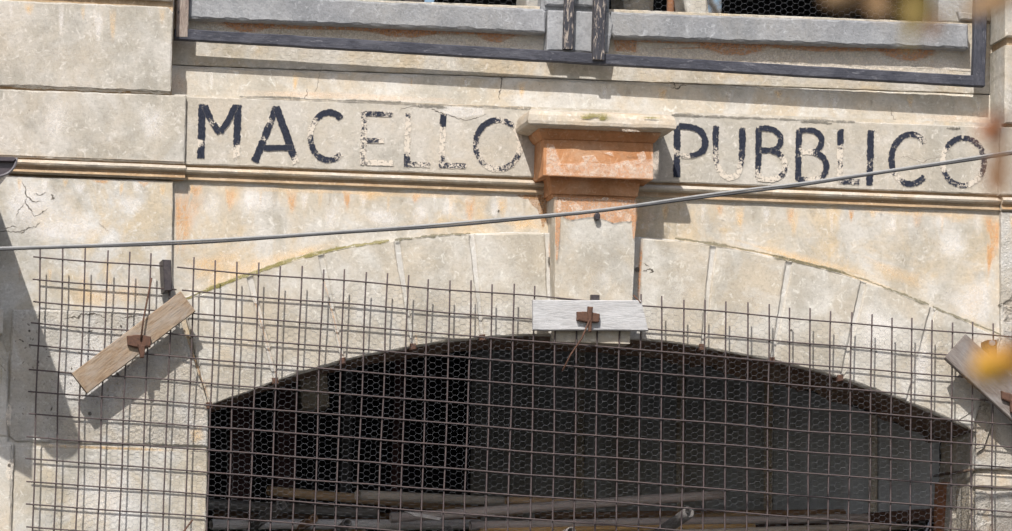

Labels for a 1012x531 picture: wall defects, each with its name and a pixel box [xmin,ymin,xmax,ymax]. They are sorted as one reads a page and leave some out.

crack [1,184,55,233]
flaking render [1000,295,1012,345]